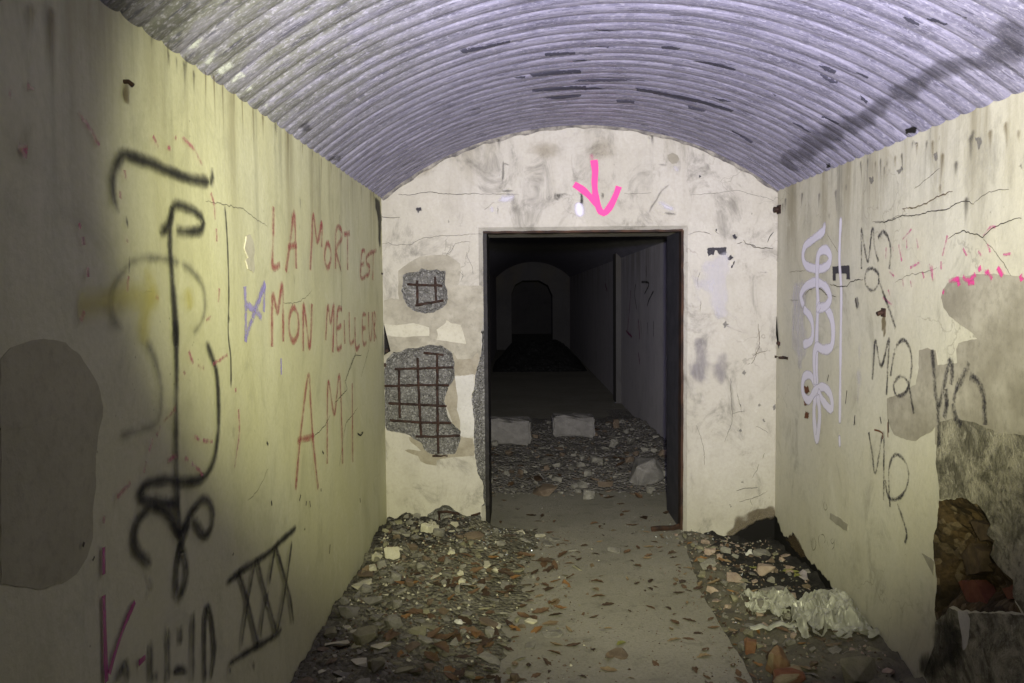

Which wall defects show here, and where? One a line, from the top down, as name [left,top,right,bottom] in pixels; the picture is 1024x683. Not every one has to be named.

crack [874,168,1009,223]
crack [948,218,1017,274]
peeling [0,339,103,590]
spalling [383,255,486,521]
flaking render [887,274,1024,683]